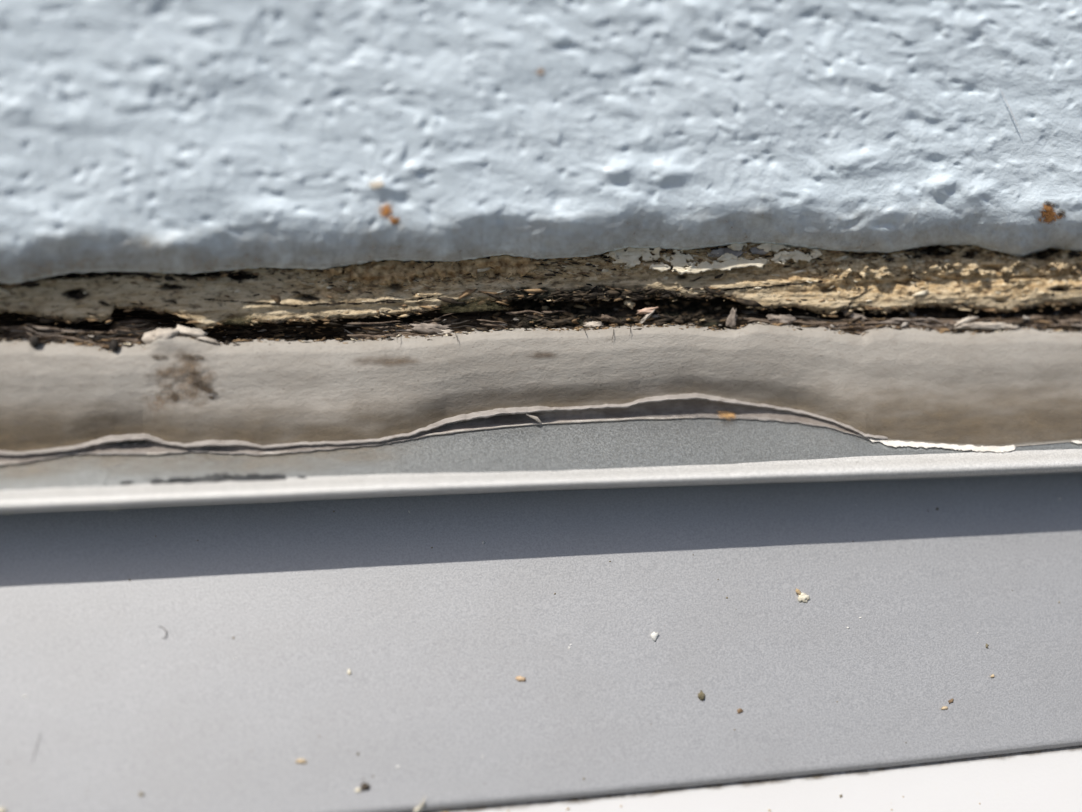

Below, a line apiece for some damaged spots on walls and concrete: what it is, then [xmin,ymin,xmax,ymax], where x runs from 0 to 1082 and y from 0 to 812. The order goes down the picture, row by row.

spalling [326,255,545,288]
spalling [604,243,1082,281]
leakage [153,355,215,403]